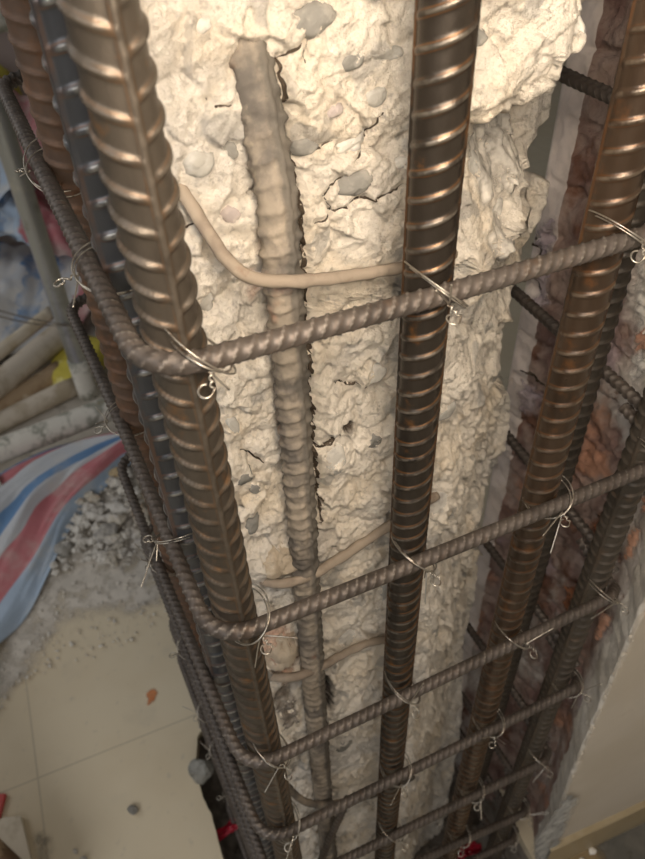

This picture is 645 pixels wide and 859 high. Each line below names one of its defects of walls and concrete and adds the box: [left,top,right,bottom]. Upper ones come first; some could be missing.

spalling [0,0,208,352]
spalling [229,38,304,275]
crack [274,40,308,103]
crack [291,112,401,321]
spalling [401,0,527,295]
spalling [577,0,645,245]
spalling [71,251,333,754]
crack [306,343,341,530]
crack [334,379,362,387]
spalling [388,303,451,565]
spalling [516,248,645,514]
spalling [382,569,424,699]